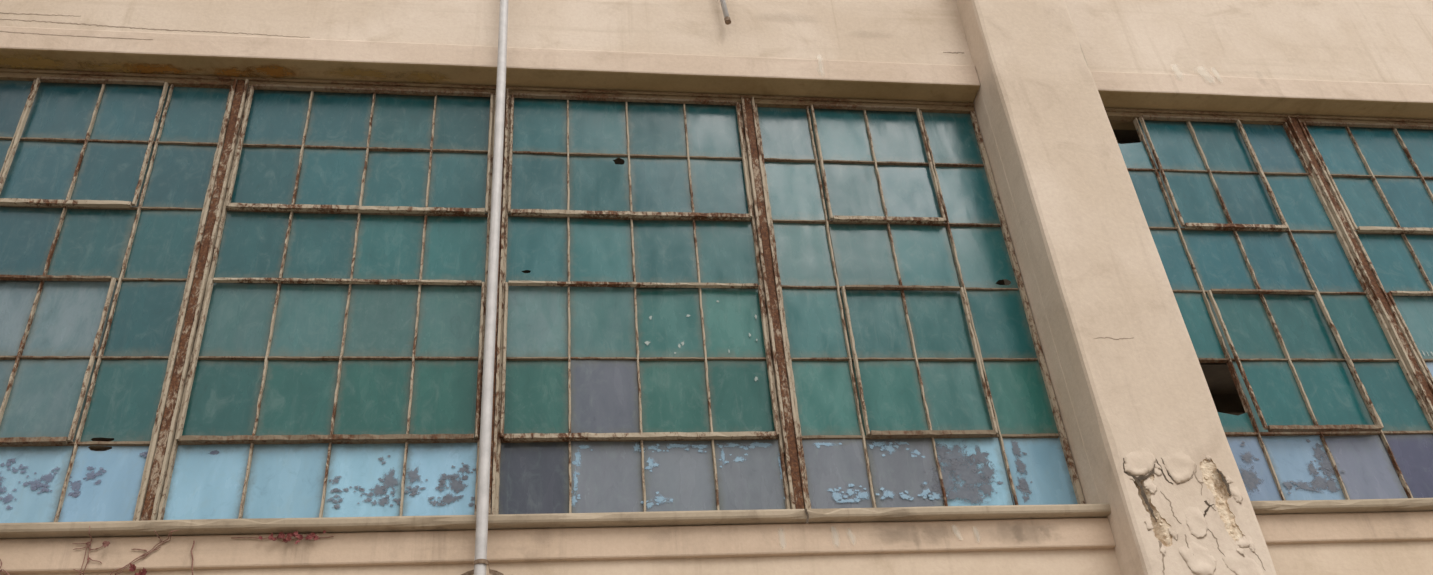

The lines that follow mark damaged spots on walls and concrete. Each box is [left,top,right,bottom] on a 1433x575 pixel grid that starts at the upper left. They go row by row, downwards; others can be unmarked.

flaking render [1129,463,1178,555]
flaking render [1198,441,1263,557]